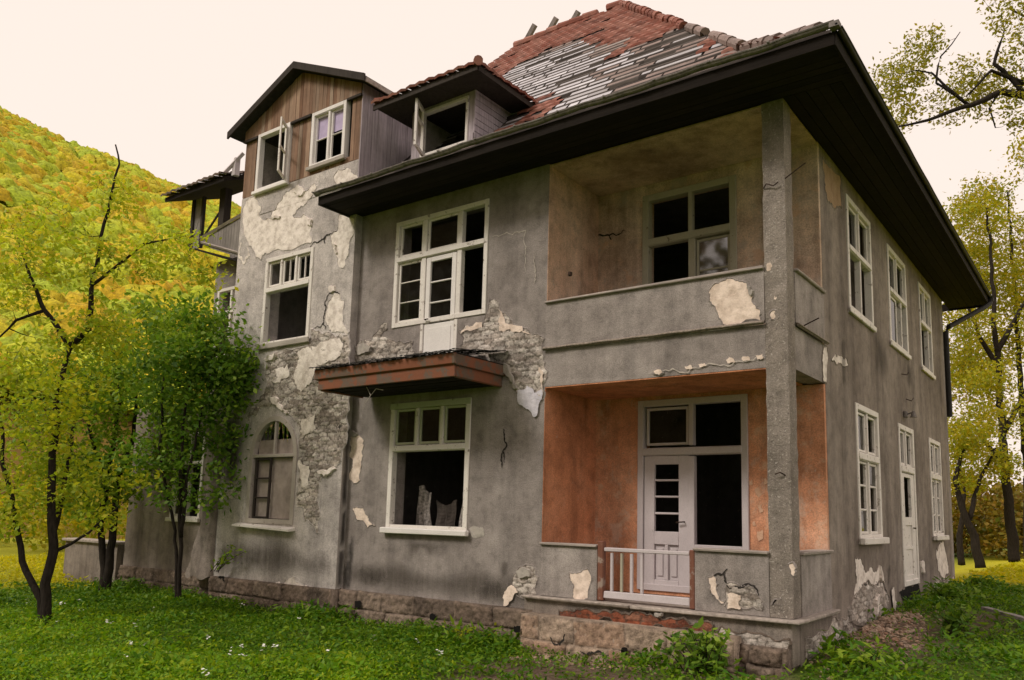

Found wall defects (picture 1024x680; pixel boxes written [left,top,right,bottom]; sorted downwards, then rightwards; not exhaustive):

peeling [238,183,318,264]
peeling [330,214,355,269]
peeling [708,277,780,325]
flaking render [458,298,549,418]
peeling [648,354,763,376]
flaking render [247,285,415,534]
crack [499,429,507,468]
flaking render [503,563,539,606]
spalling [558,540,955,661]